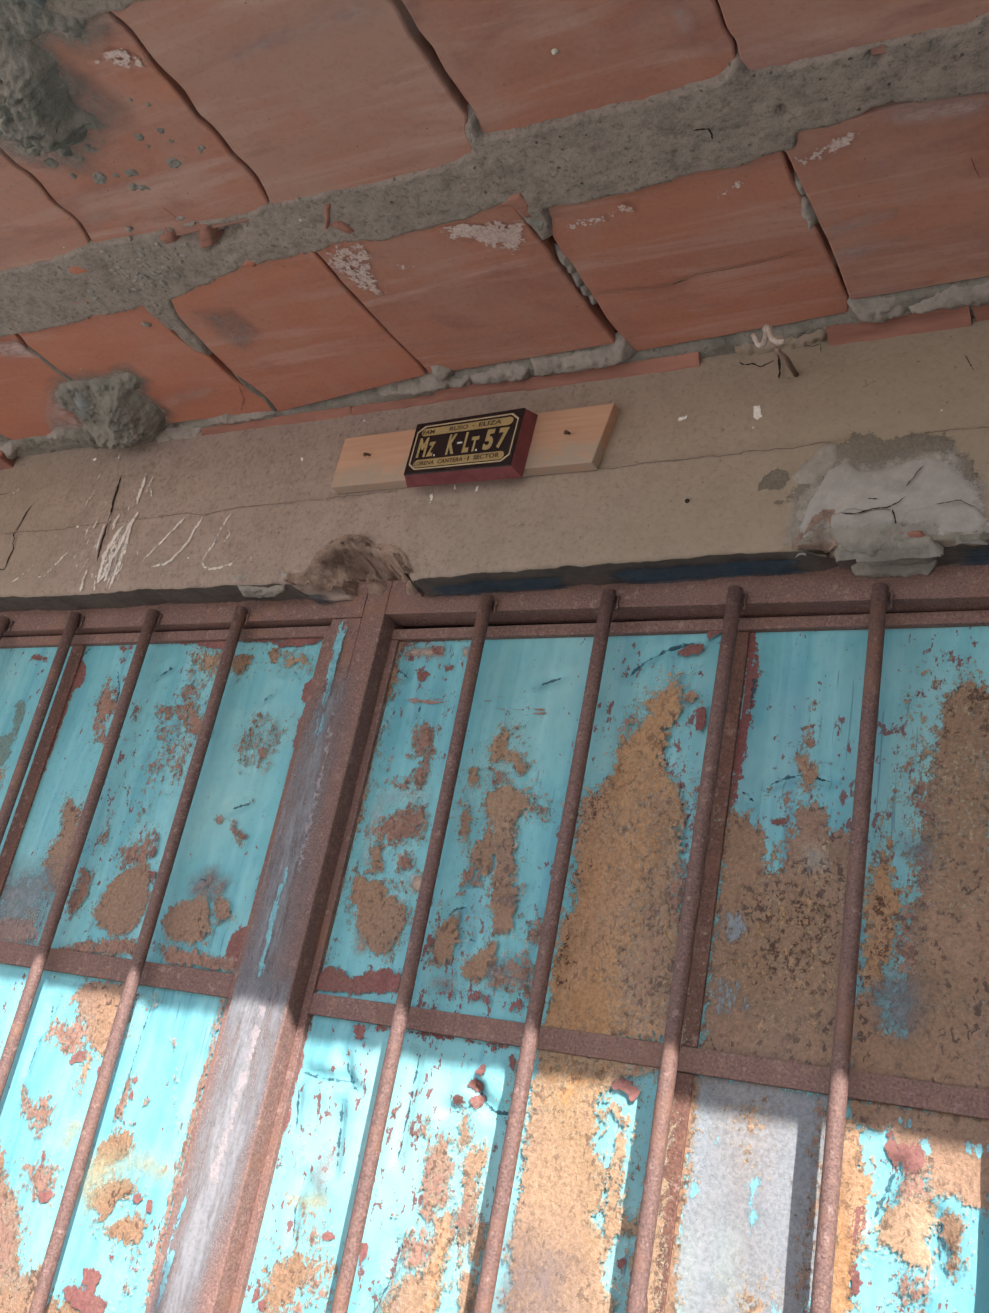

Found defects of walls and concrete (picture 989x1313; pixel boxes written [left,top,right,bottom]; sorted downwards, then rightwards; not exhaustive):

crack [0,492,31,570]
crack [97,475,122,560]
spalling [233,534,419,598]
spalling [792,509,839,553]